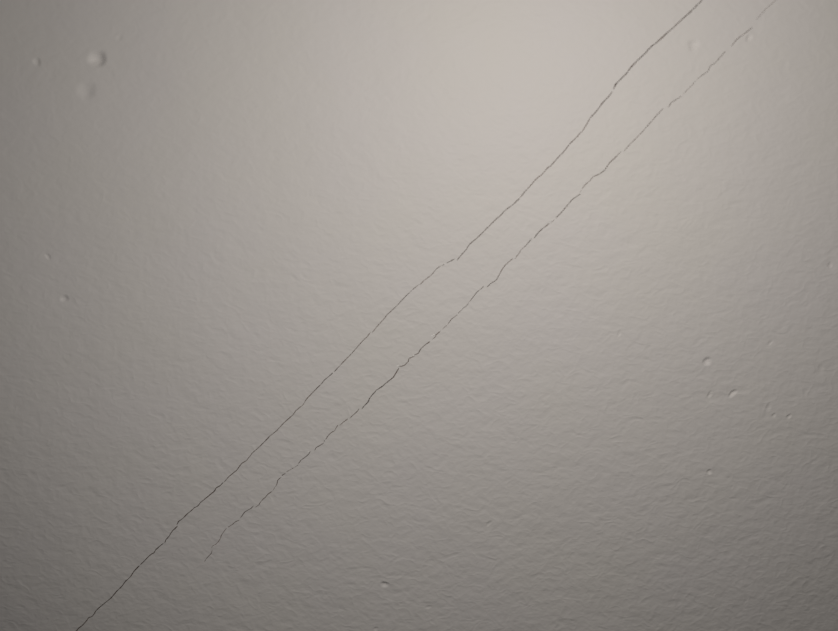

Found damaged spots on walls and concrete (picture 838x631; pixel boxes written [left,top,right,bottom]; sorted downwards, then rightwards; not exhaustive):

crack [76,0,702,631]